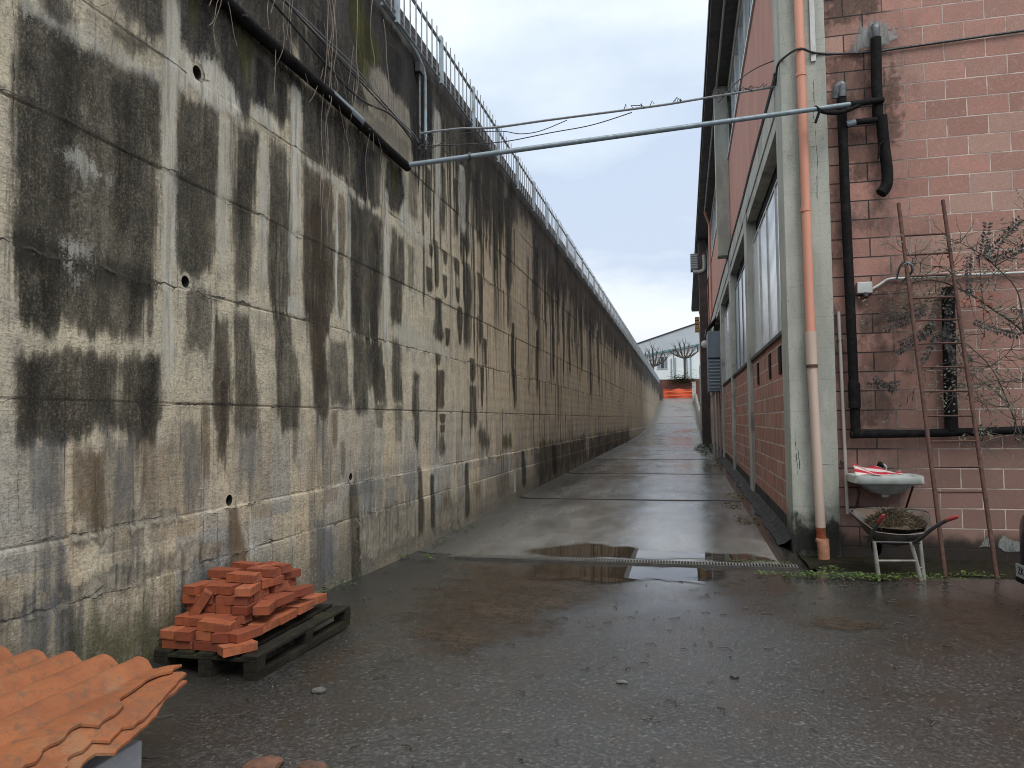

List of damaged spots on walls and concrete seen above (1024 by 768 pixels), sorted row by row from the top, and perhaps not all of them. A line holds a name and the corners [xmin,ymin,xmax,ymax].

crack [0,0,480,320]
crack [0,237,633,623]
damp [12,0,659,516]